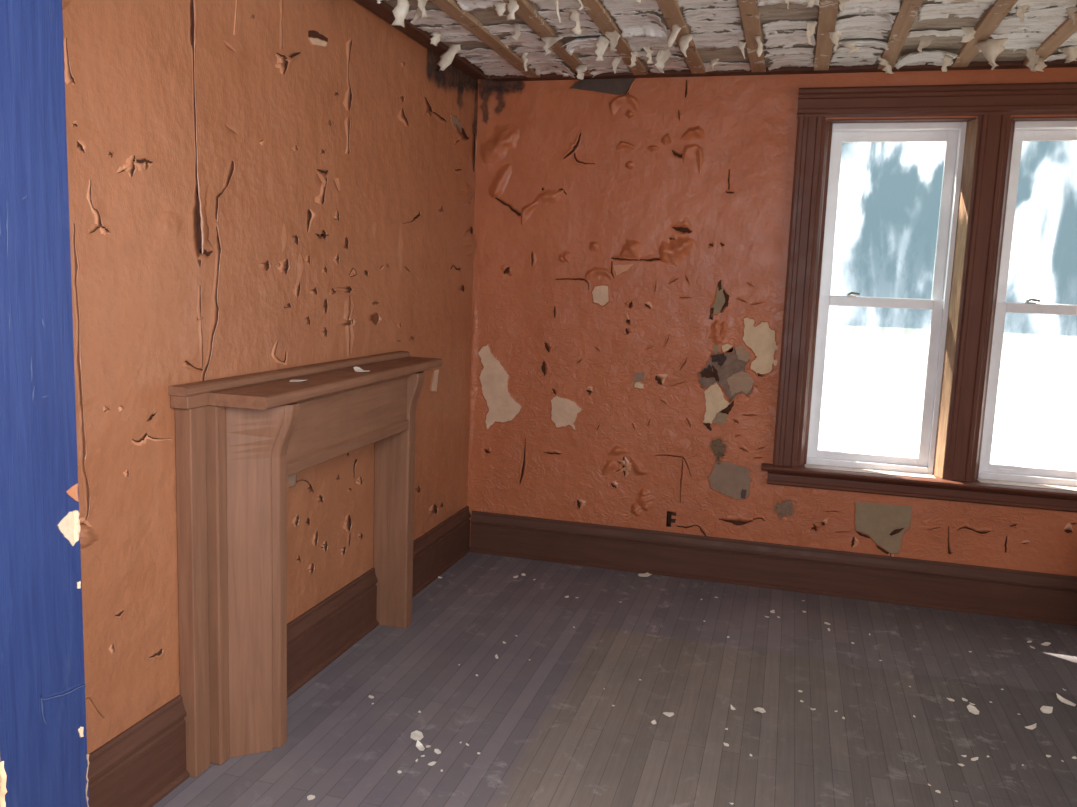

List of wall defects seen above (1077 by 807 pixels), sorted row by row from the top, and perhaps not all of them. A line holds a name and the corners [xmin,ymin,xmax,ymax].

peeling [308,30,328,48]
peeling [377,0,820,96]
peeling [829,0,1077,74]
leakage [427,49,523,135]
crack [183,0,237,381]
peeling [709,280,730,320]
crack [71,224,91,521]
peeling [478,343,523,431]
peeling [550,395,583,431]
peeling [697,316,778,431]
peeling [57,483,80,546]
peeling [853,500,914,554]